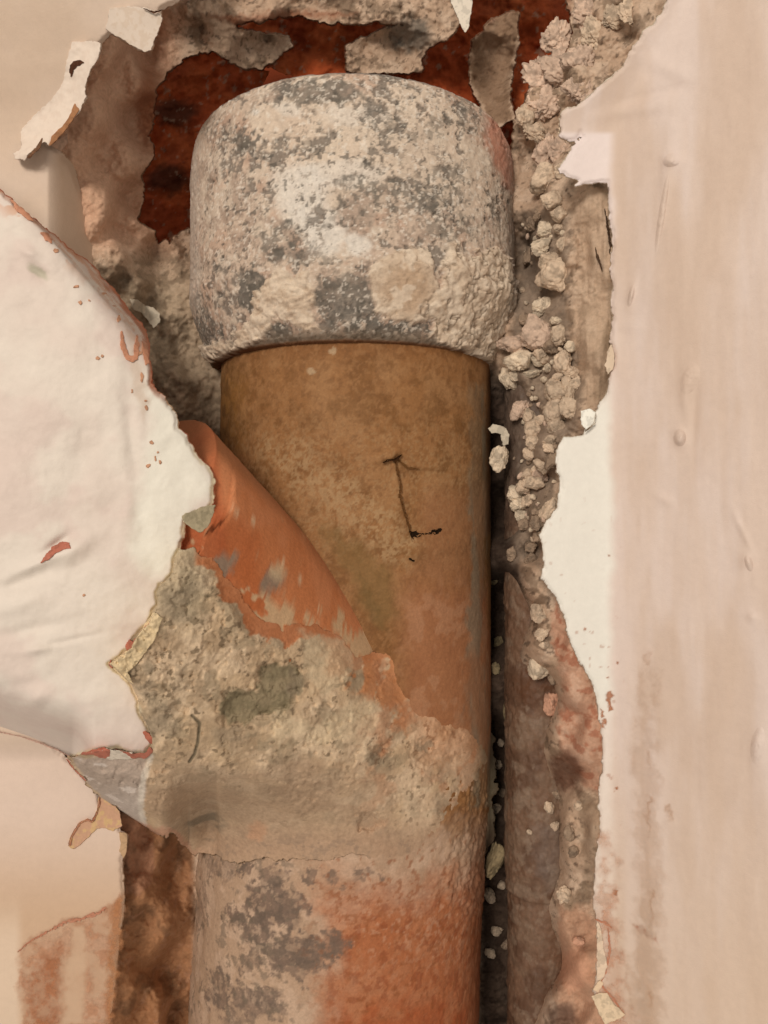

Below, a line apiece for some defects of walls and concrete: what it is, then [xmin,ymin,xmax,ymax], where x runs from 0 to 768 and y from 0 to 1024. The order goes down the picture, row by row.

flaking render [13,40,101,161]
flaking render [105,6,163,52]
flaking render [138,17,385,243]
flaking render [382,0,570,150]
flaking render [129,299,161,328]
flaking render [604,344,615,374]
peeling [68,797,128,858]
peeling [591,921,625,1024]